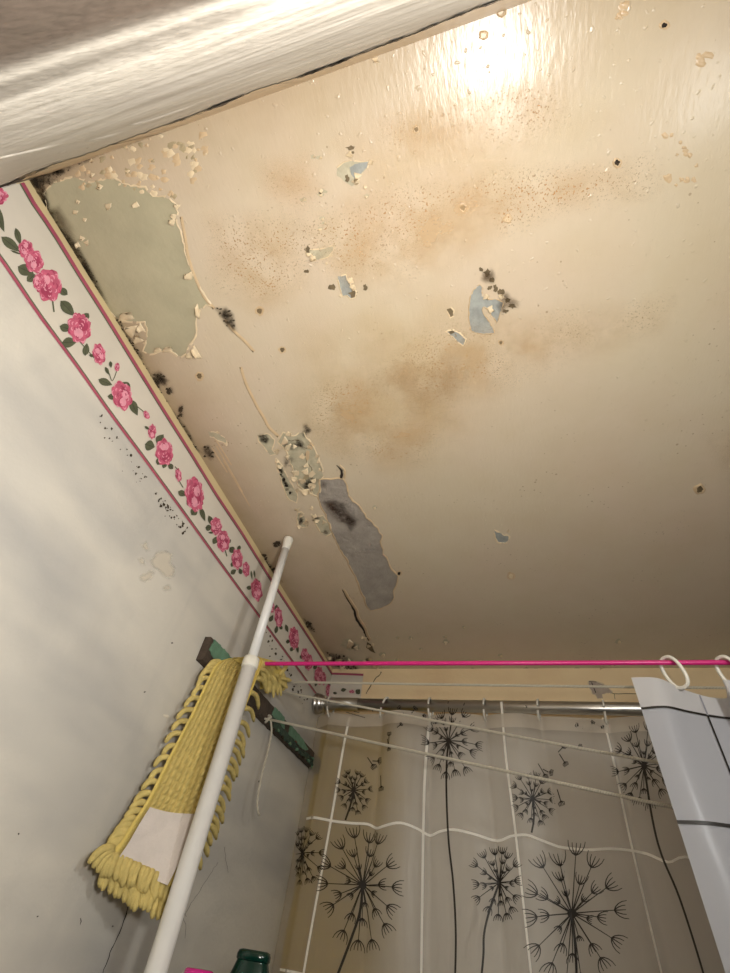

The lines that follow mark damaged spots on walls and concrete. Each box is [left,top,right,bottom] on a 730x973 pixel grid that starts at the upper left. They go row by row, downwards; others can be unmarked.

peeling [0,0,532,359]
spalling [257,427,402,611]
crack [342,589,382,694]